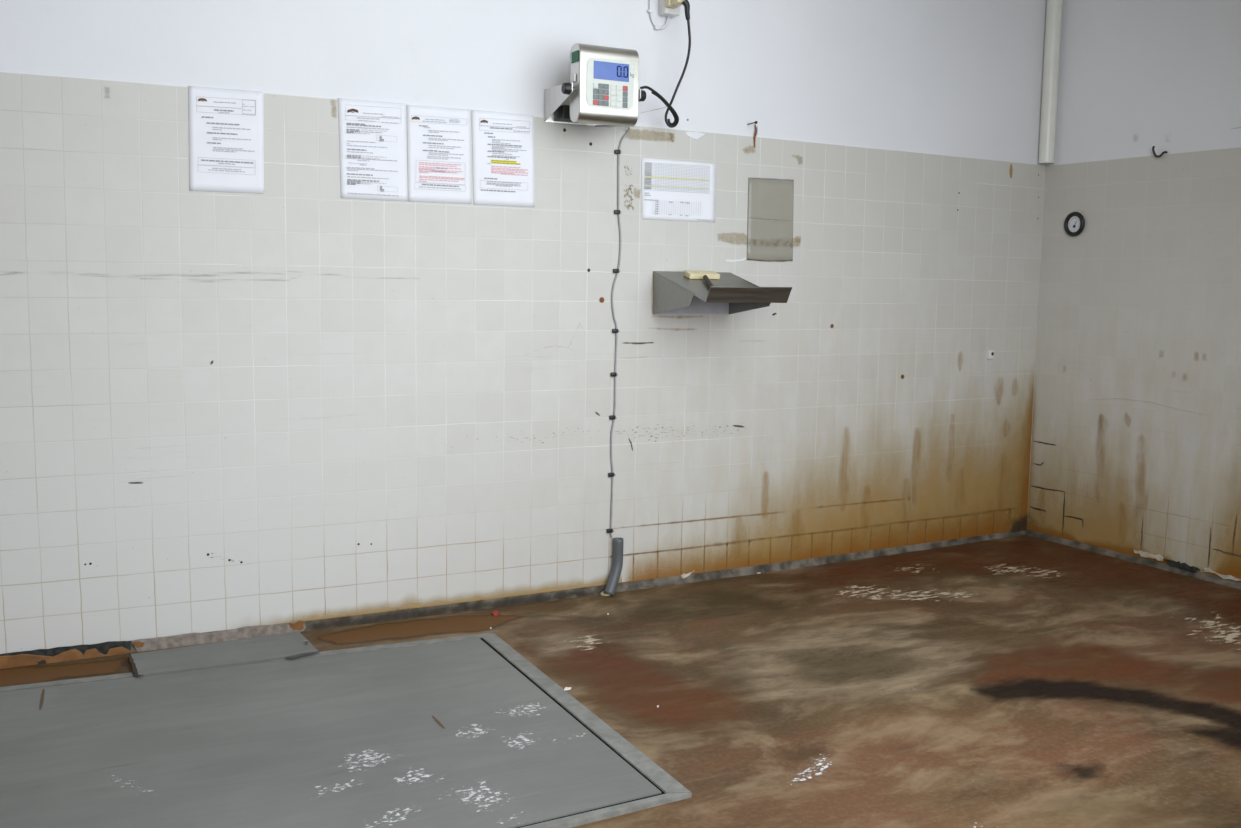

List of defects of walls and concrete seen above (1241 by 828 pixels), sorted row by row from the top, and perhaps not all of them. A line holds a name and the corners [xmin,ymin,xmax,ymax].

water stain [736,428,1144,556]
water stain [1210,502,1241,573]
peeling [0,641,144,687]